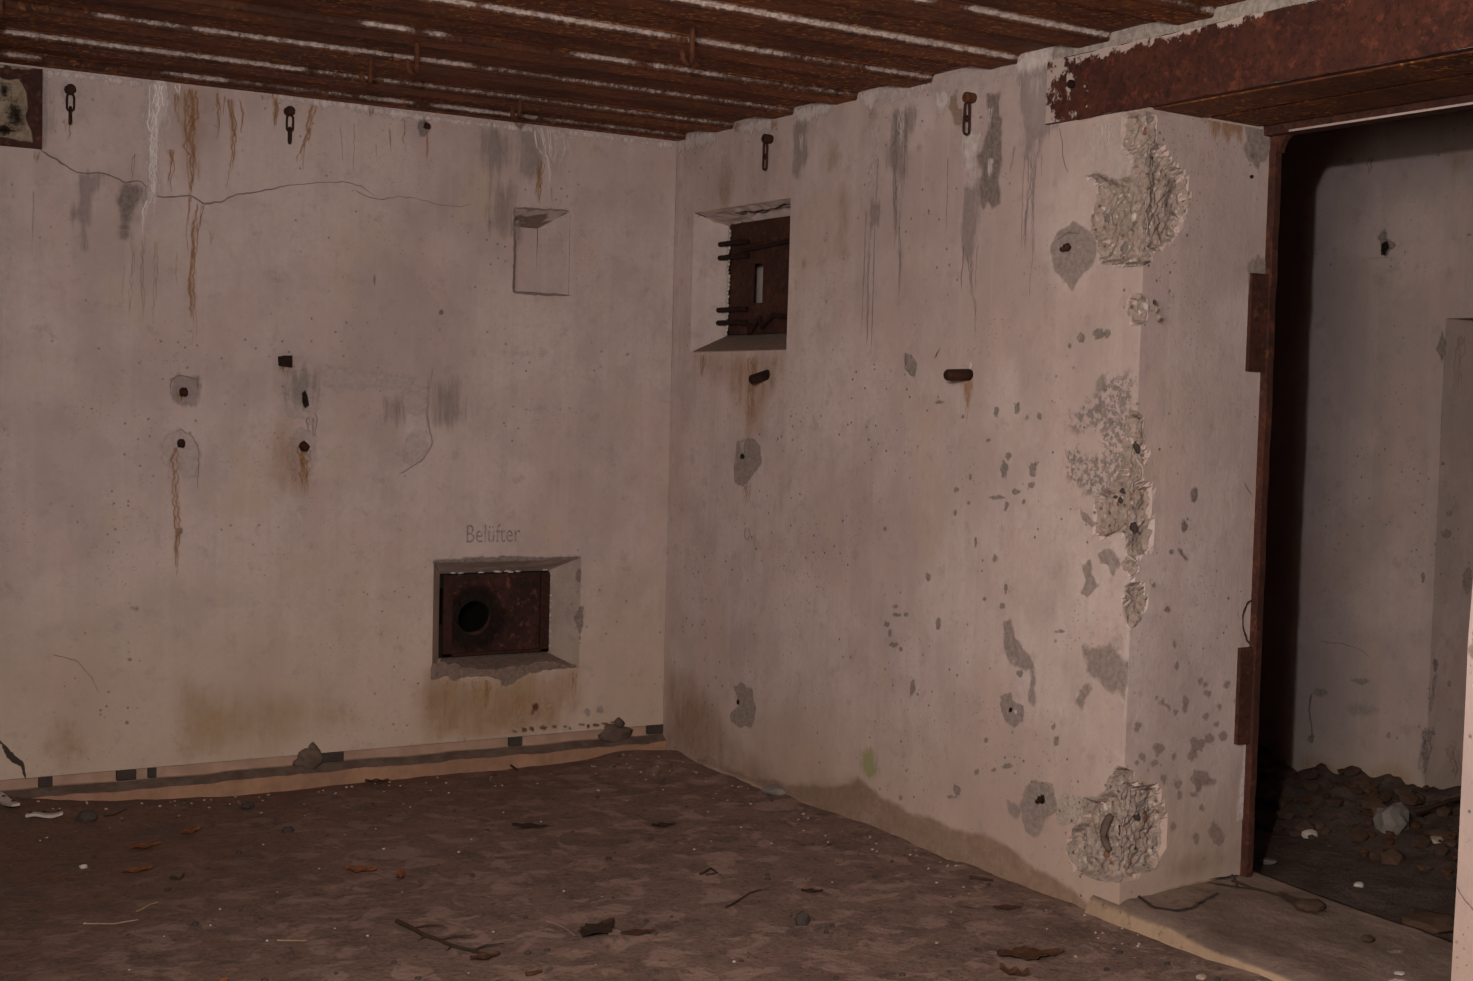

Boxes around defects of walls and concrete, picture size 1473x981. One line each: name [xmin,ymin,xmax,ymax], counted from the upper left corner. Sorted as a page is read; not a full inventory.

corrosion [168,90,199,183]
corrosion [217,94,244,164]
crack [40,123,468,207]
damp [737,117,773,135]
damp [794,102,830,174]
damp [859,47,1053,333]
spalling [1051,108,1191,289]
corrosion [188,198,201,302]
crack [512,207,571,296]
spalling [1066,377,1153,707]
crack [0,741,26,778]
spalling [1008,767,1164,883]